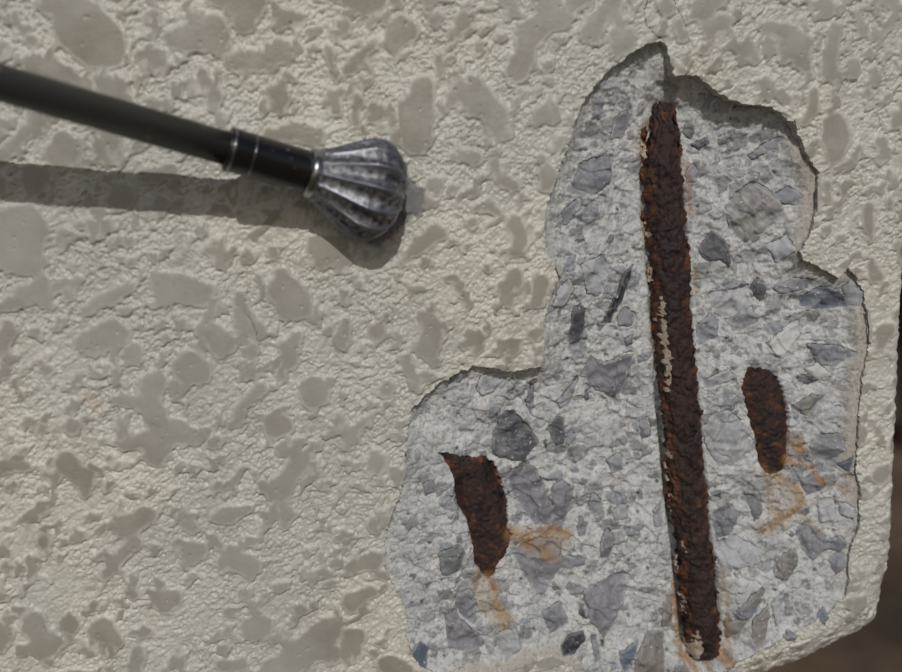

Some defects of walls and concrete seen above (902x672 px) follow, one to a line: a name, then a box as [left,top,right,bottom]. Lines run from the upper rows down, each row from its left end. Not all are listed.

spalling [384,41,873,672]
corrosion [640,193,653,222]